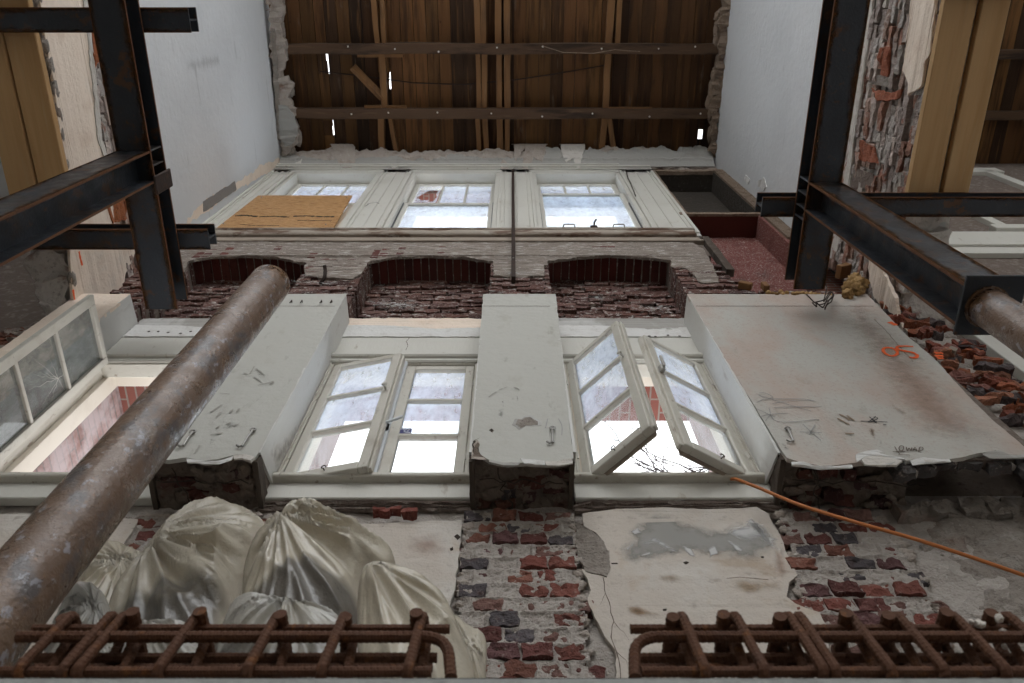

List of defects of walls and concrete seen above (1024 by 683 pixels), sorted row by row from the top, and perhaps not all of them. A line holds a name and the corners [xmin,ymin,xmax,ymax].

flaking render [842,0,930,192]
spalling [121,454,256,552]
spalling [252,499,298,524]
flaking render [316,440,1024,678]
crack [600,577,628,678]